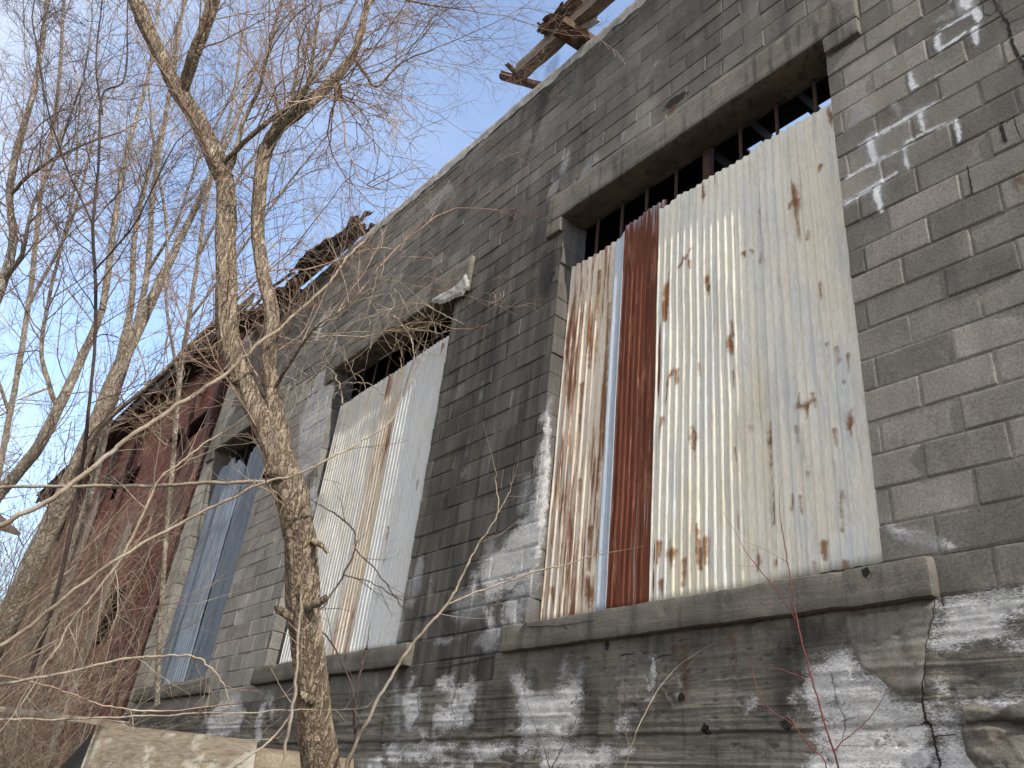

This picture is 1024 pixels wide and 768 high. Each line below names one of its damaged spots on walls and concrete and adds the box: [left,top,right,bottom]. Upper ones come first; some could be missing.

crack [981,0,1024,70]
rust [790,184,808,240]
rust [587,270,610,509]
efflorescence [469,397,552,641]
rust [585,526,593,608]
rust [656,523,708,586]
efflorescence [926,589,1024,653]
efflorescence [367,668,635,768]
efflorescence [647,658,658,701]
damp [789,648,1024,768]
crack [908,602,955,768]